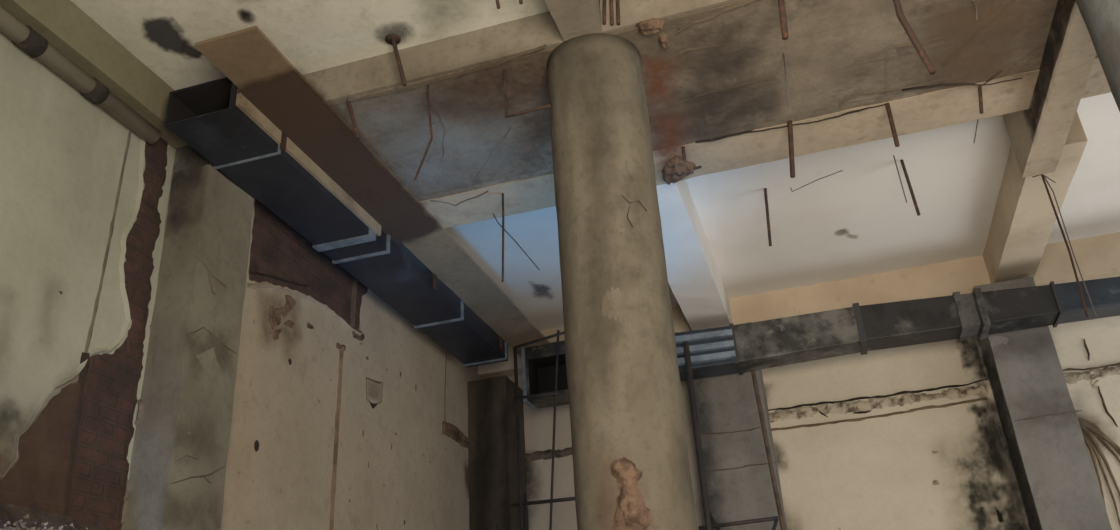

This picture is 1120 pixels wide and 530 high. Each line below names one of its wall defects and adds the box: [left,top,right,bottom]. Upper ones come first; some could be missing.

leakage [144,19,202,58]
crack [348,44,546,161]
crack [430,191,488,206]
spalling [662,157,702,185]
flaking render [0,137,168,530]
flaking render [248,198,369,360]
leakage [961,337,989,379]
leakage [18,381,79,515]
spalling [610,457,651,530]
leakage [969,397,1030,530]